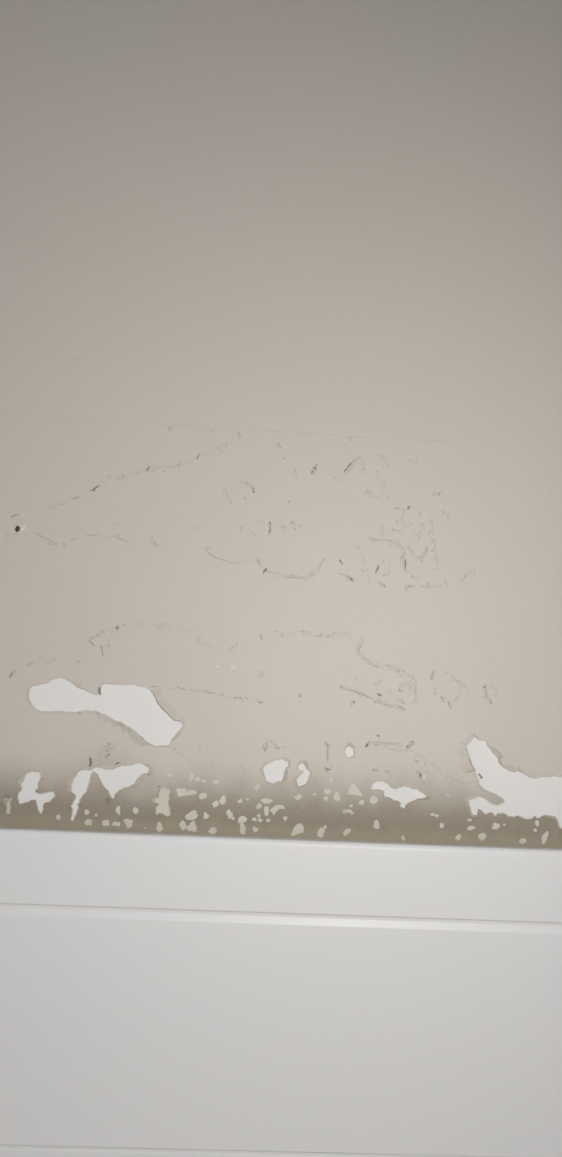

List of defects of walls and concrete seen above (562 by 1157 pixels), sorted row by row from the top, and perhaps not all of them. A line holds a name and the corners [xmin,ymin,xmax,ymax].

crack [203,453,477,591]
crack [9,622,130,678]
crack [260,629,468,711]
peeling [25,675,185,748]
peeling [0,754,444,838]
crack [313,741,334,796]
crack [364,735,414,777]
peeling [455,733,562,844]